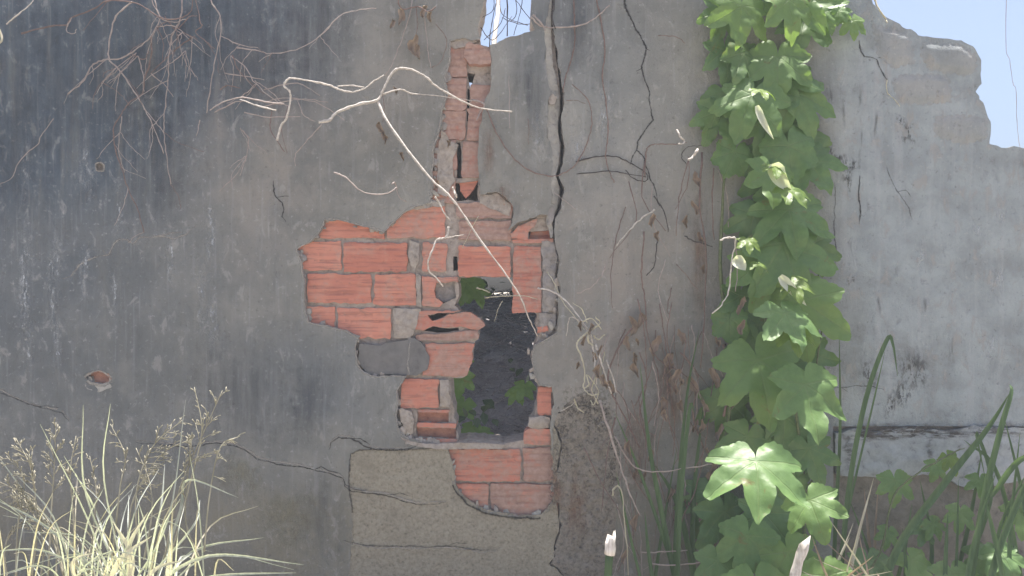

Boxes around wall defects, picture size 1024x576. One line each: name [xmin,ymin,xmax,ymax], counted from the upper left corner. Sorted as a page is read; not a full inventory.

crack [136,435,446,505]
flaking render [295,39,621,576]
crack [544,0,564,335]
crack [623,0,658,200]